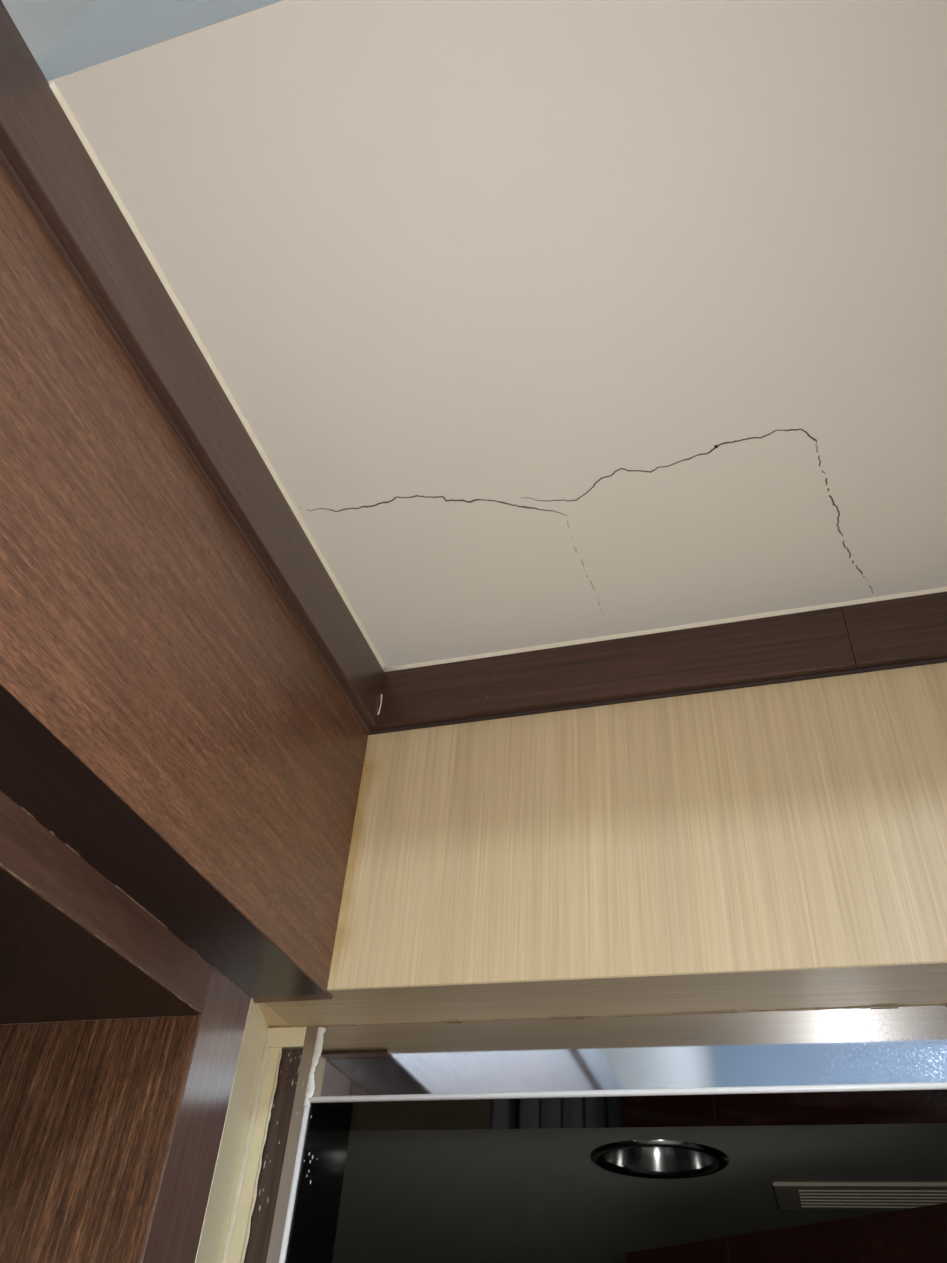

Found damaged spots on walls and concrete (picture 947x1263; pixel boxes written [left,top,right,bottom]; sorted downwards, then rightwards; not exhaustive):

crack [299,428,873,615]